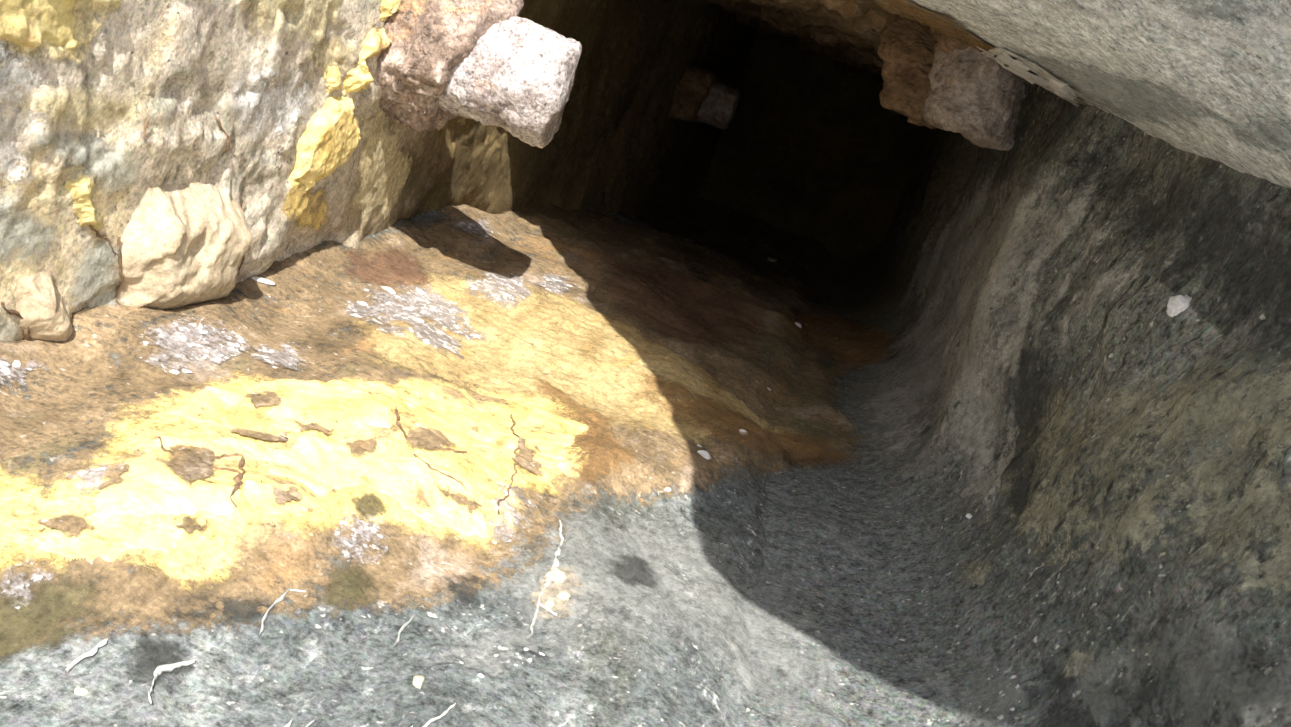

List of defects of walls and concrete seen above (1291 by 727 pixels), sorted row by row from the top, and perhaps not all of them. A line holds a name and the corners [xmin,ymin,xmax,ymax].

damp [140,318,304,374]
damp [336,285,487,359]